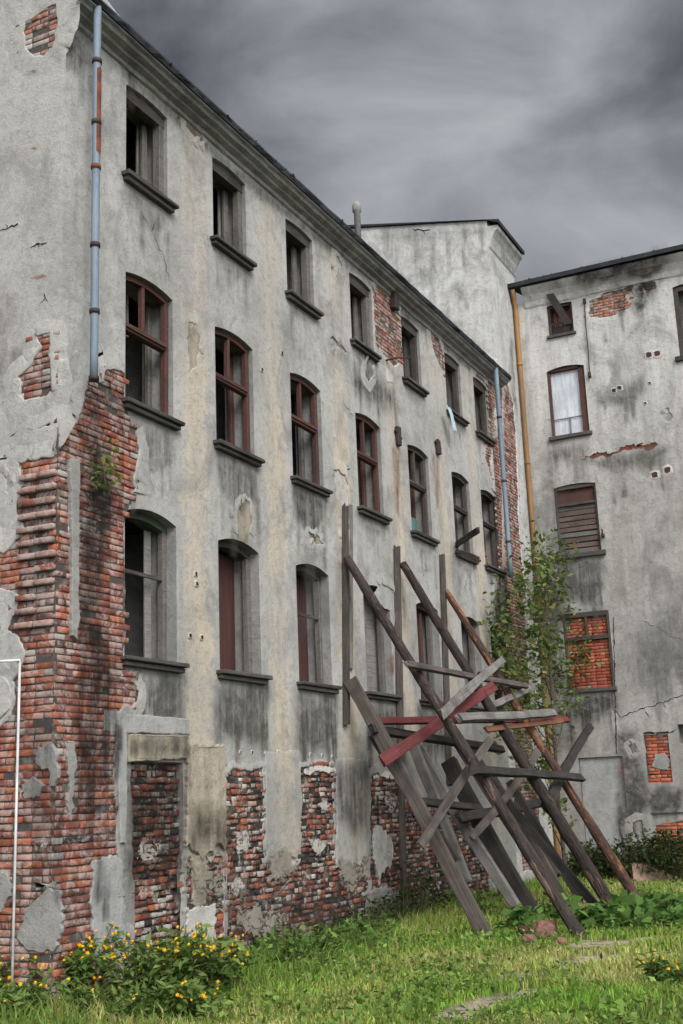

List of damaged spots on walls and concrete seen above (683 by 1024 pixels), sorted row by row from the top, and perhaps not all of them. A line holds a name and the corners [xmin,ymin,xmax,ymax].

flaking render [7,0,80,77]
flaking render [324,279,404,396]
flaking render [368,241,391,265]
flaking render [577,255,668,331]
flaking render [476,373,545,831]
flaking render [0,307,453,1005]
crack [613,617,683,754]
flaking render [417,787,492,894]
flaking render [516,845,537,882]